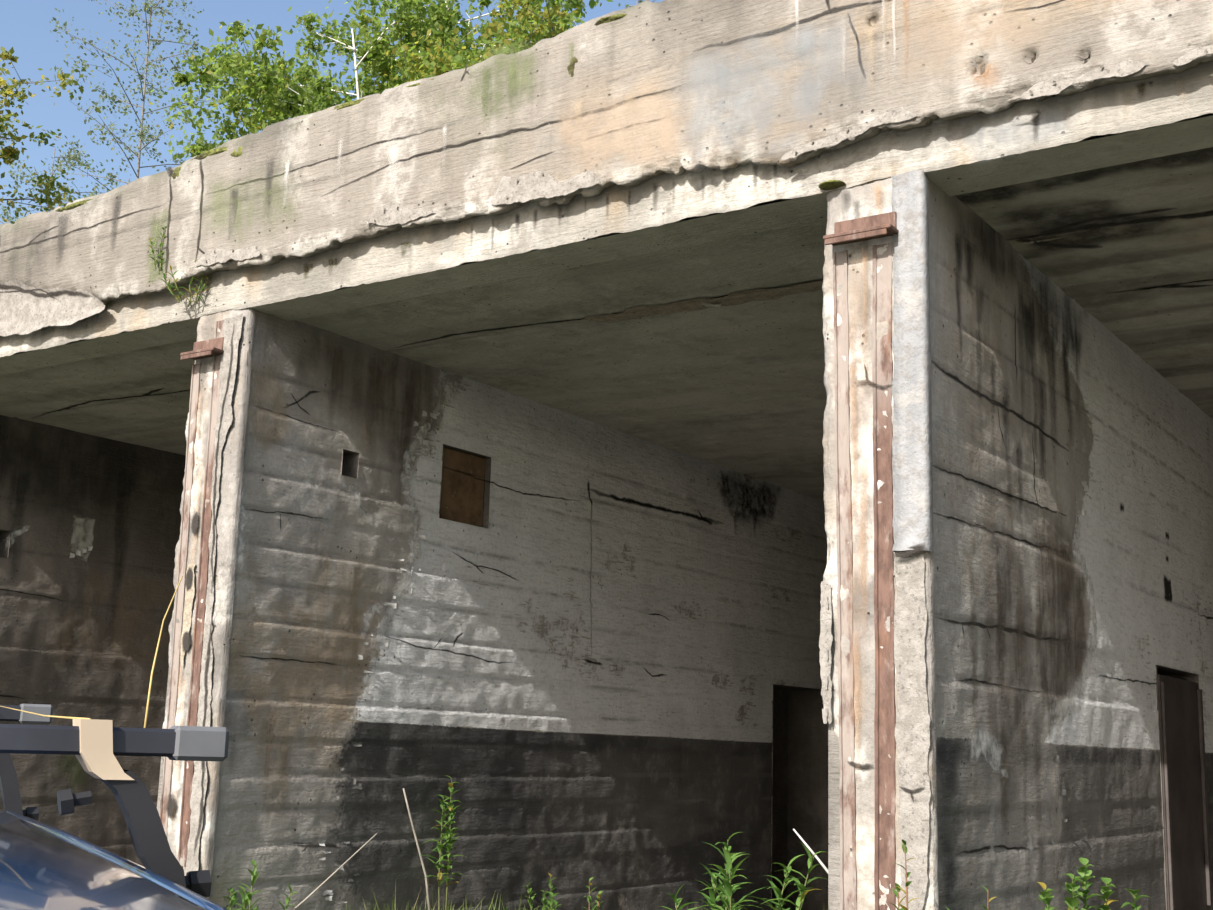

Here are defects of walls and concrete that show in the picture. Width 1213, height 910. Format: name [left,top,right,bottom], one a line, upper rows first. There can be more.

spalling [1008,59,1149,101]
crack [0,89,670,277]
leakage [958,186,1020,204]
leakage [1037,147,1213,189]
spalling [0,279,105,336]
leakage [1025,280,1078,403]
crack [932,366,1066,516]
peeling [69,517,95,562]
crack [453,470,717,665]
crack [936,513,1048,547]
crack [386,633,509,664]
leakage [971,518,1097,783]